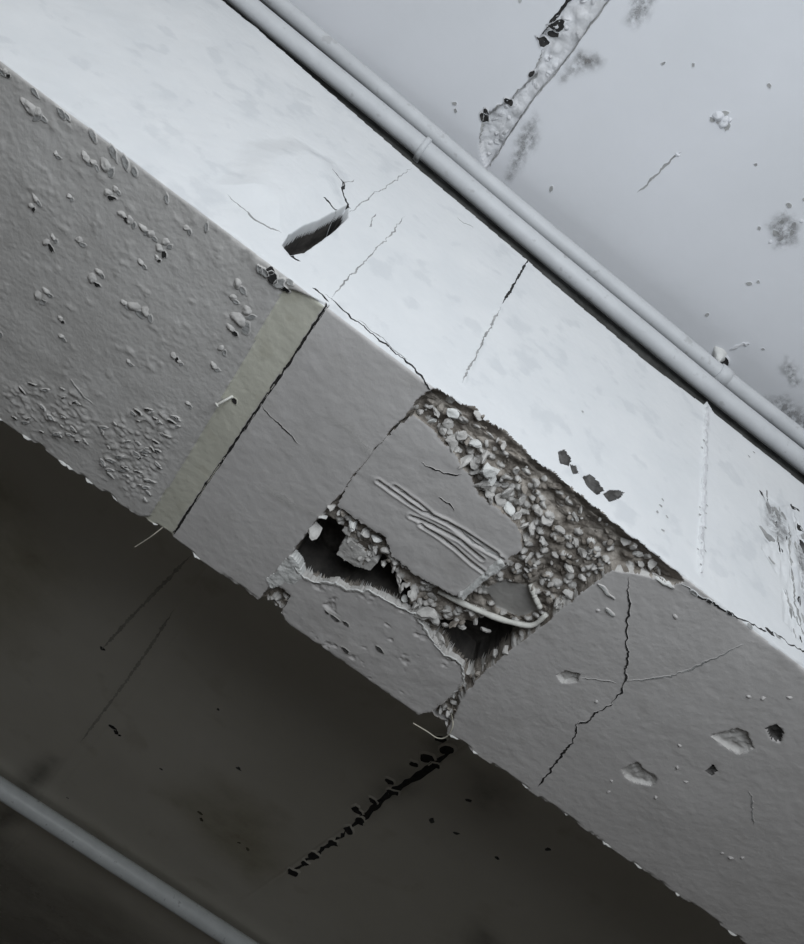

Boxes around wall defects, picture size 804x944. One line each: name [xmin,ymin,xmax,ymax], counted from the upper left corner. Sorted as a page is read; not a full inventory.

peeling [528,16,570,85]
peeling [479,96,518,145]
crack [227,194,300,262]
spalling [284,215,342,256]
crack [323,169,410,237]
crack [462,260,528,382]
crack [172,217,432,535]
spalling [259,586,290,609]
spalling [293,388,684,767]
crack [538,577,804,786]
spalling [711,728,755,755]
spalling [765,724,785,742]